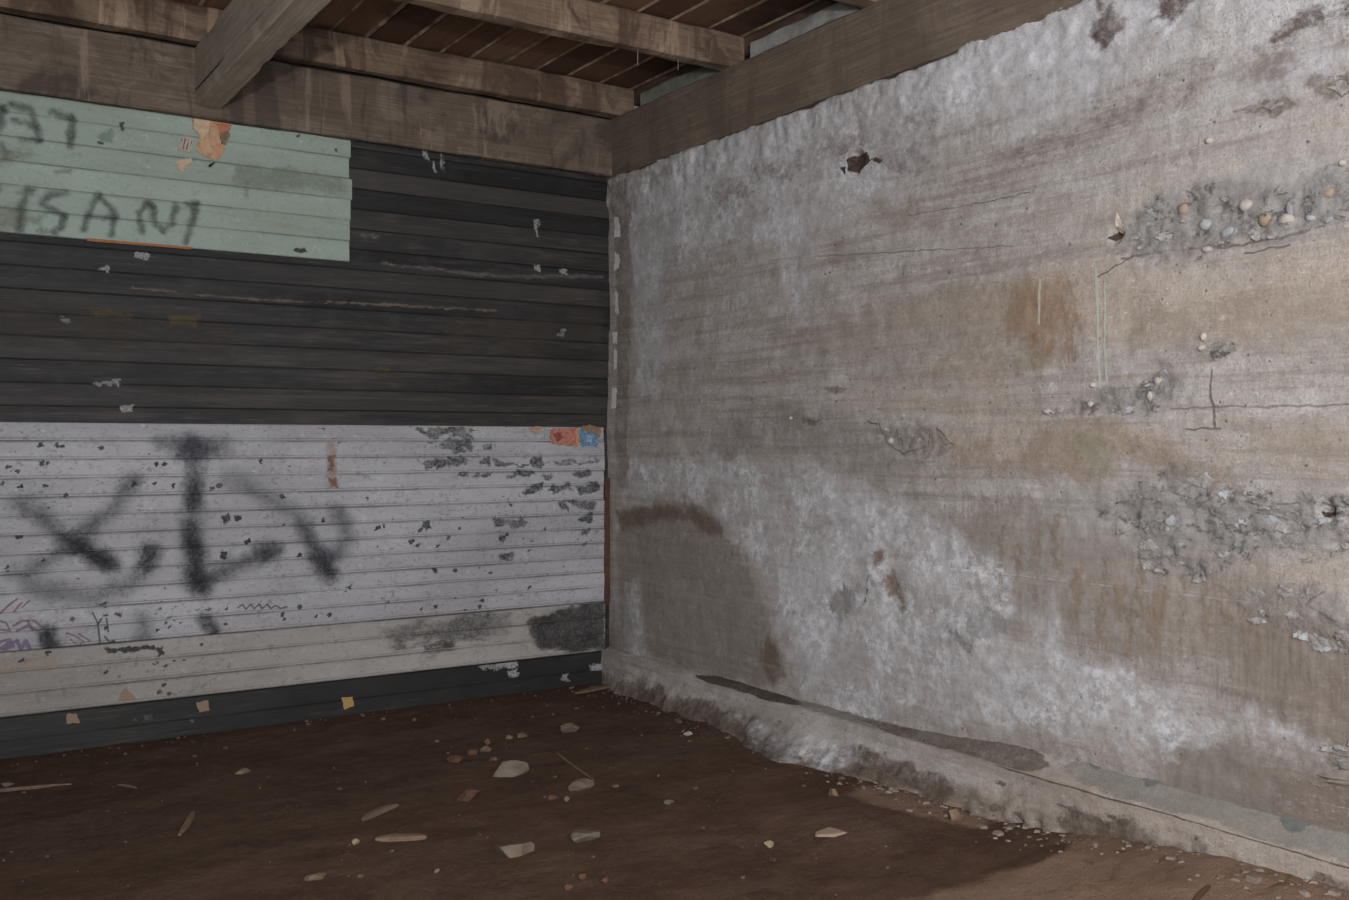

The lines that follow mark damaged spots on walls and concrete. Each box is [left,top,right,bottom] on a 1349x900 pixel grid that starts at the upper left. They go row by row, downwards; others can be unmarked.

spalling [1114,159,1349,263]
crack [1171,369,1233,431]
rust [327,455,338,488]
peeling [410,426,600,546]
peeling [479,503,532,574]
spalling [1096,466,1349,584]
damp [619,454,1220,750]
damp [793,737,844,766]